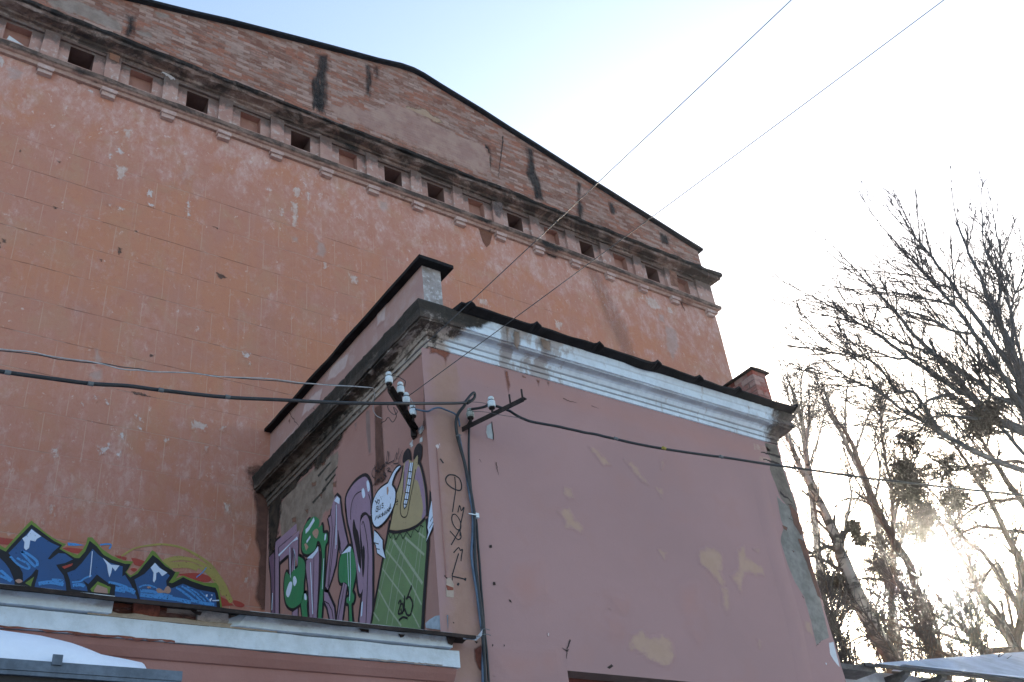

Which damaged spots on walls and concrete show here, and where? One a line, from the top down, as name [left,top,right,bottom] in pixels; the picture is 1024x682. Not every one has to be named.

flaking render [278,443,341,550]
flaking render [421,347,841,682]